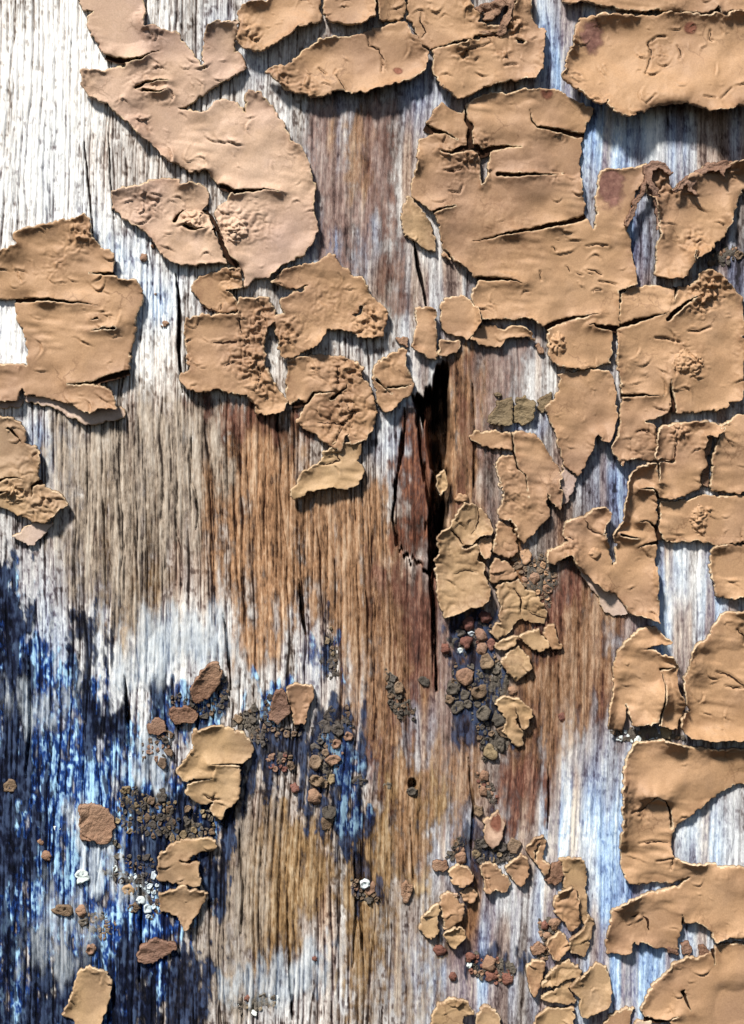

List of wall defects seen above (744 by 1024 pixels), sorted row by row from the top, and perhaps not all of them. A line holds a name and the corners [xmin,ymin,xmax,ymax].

crack [105,52,160,92]
crack [423,106,552,214]
crack [531,121,584,139]
peeling [0,213,157,546]
peeling [79,0,744,762]
crack [544,286,711,353]
peeling [78,661,355,931]
crack [638,797,673,870]
peeling [418,835,478,956]
peeling [465,770,613,1024]
peeling [51,904,118,1024]
peeling [430,996,501,1024]